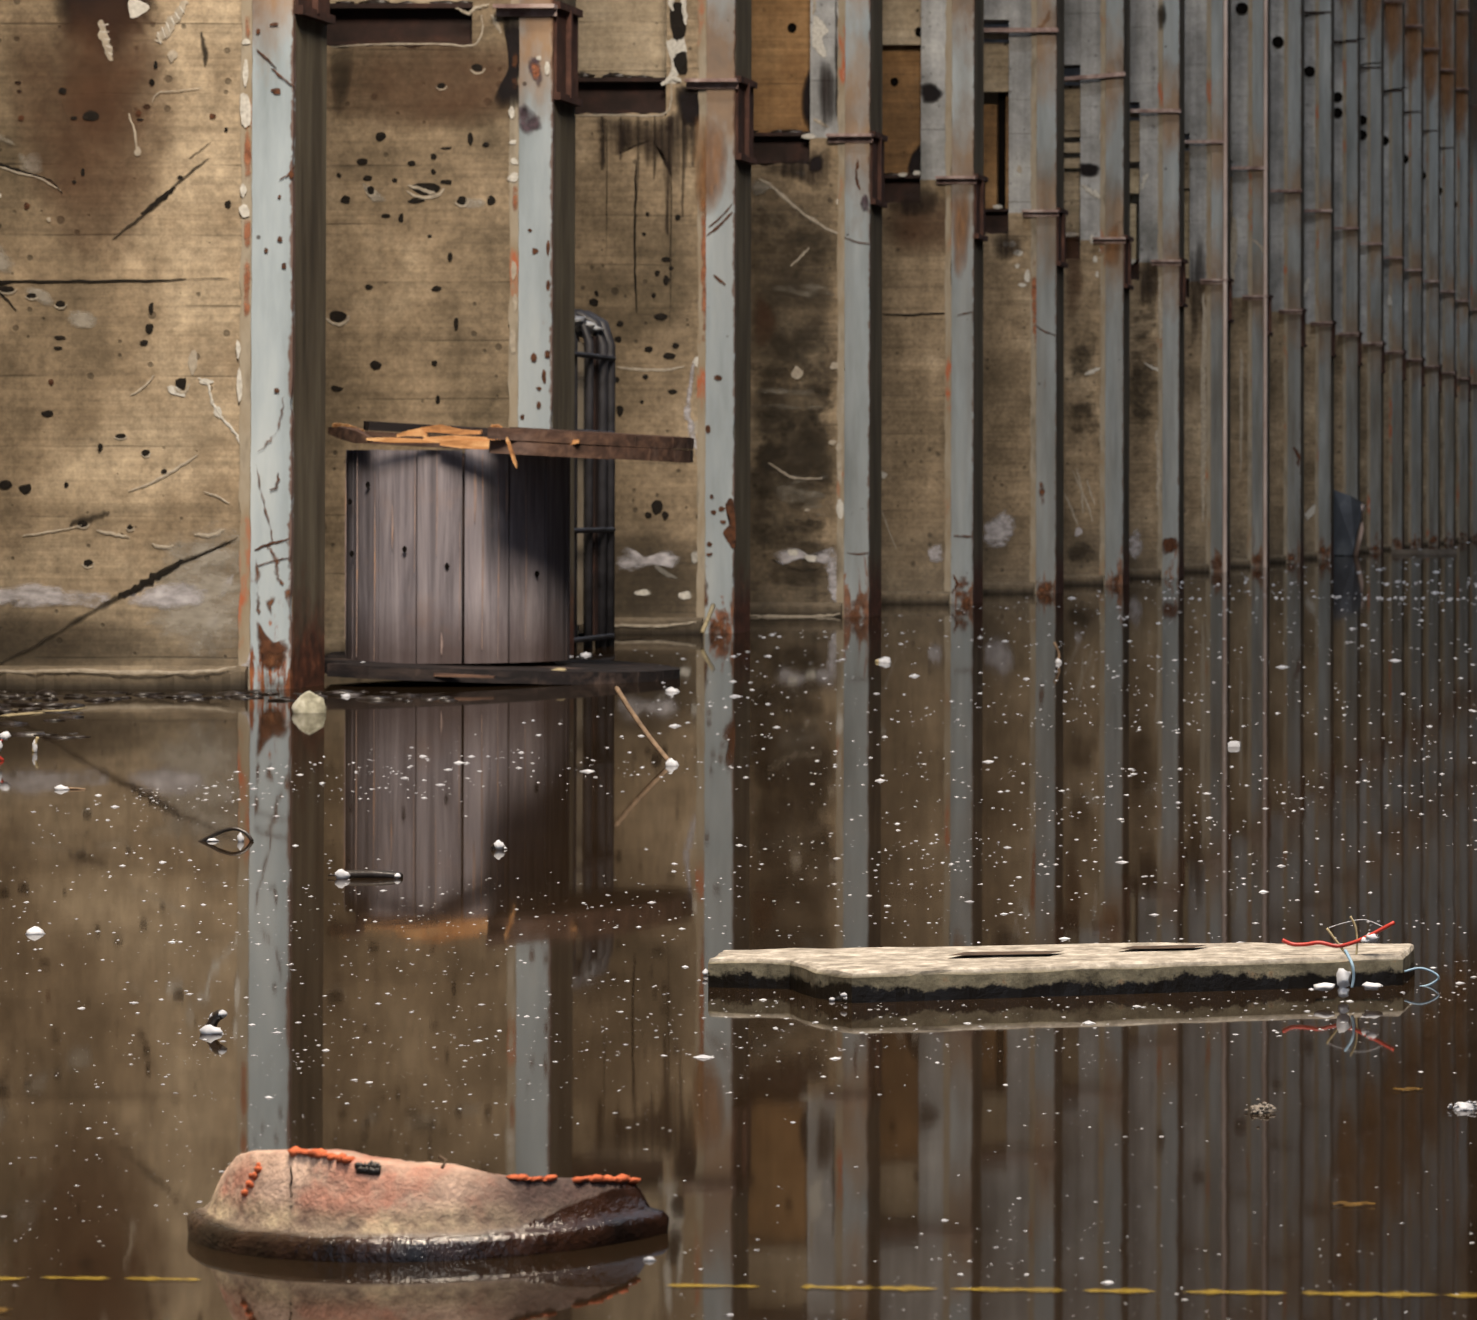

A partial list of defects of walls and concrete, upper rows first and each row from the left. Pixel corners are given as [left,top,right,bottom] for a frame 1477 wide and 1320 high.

peeling [575,0,688,117]
leakage [601,116,694,234]
crack [0,537,291,664]
corrosion [256,563,290,668]
corrosion [709,617,727,634]